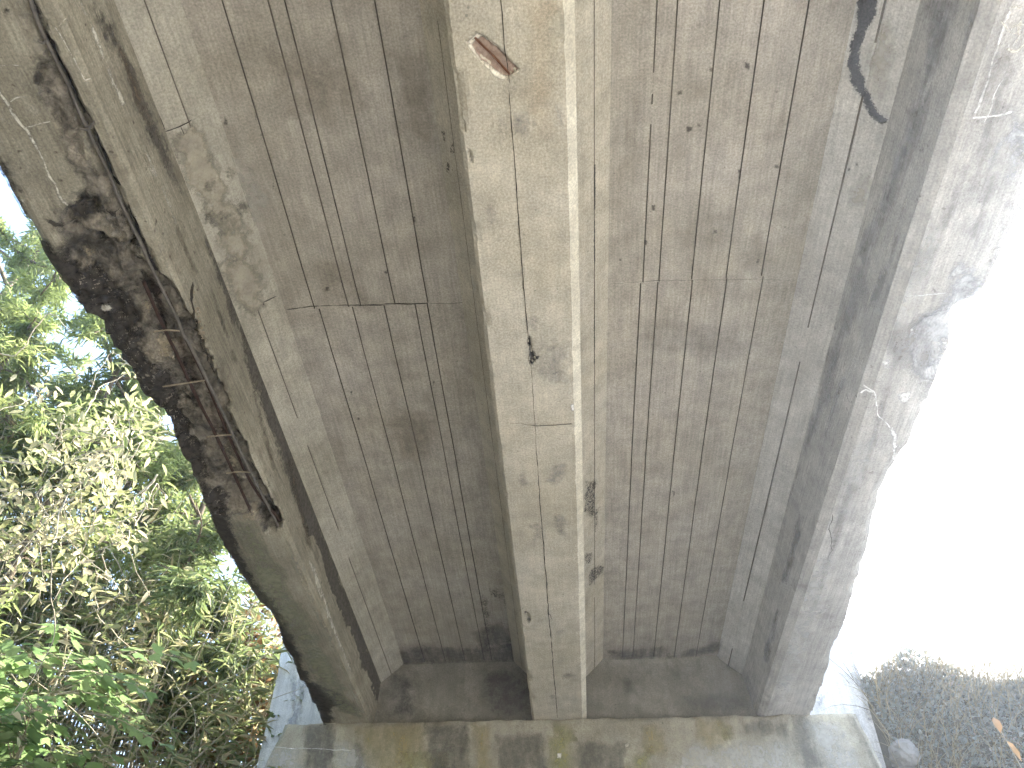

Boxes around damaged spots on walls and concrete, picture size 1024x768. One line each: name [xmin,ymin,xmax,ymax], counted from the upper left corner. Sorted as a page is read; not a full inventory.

spalling [468,34,519,79]
leakage [847,0,888,124]
crack [0,92,68,206]
crack [500,0,528,332]
spalling [28,0,282,531]
crack [860,385,897,461]
crack [516,364,571,718]